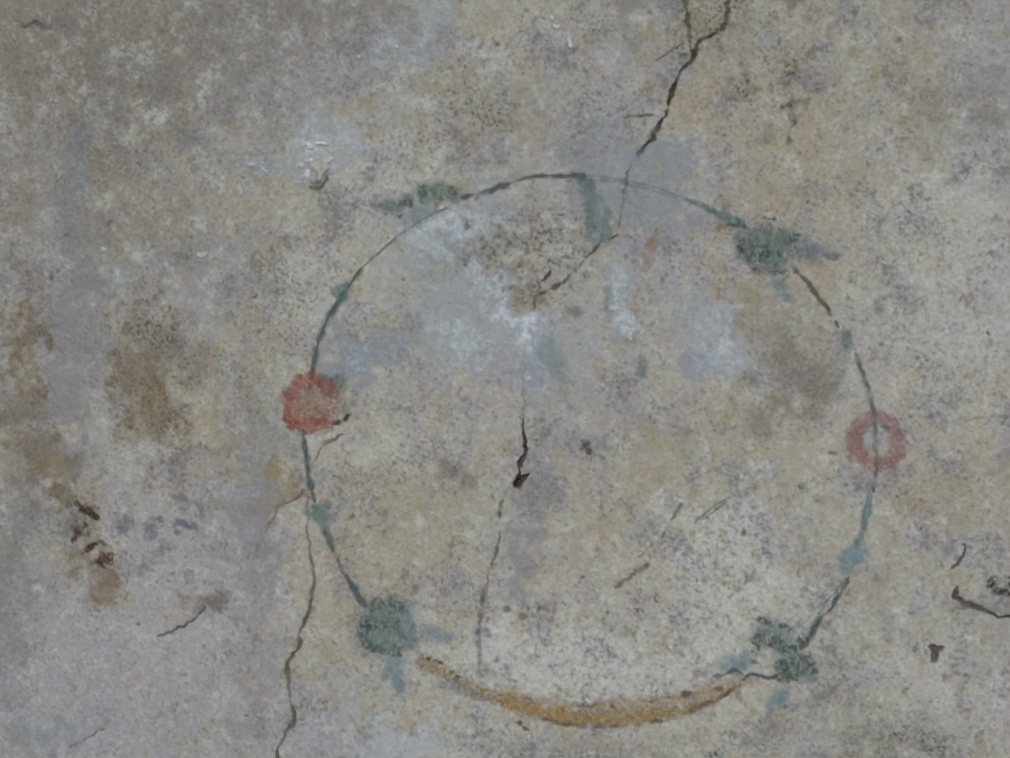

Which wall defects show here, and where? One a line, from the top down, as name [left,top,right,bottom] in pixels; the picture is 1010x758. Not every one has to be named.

crack [622,1,730,202]
peeling [298,141,333,190]
crack [532,271,569,312]
crack [513,425,529,487]
crack [952,546,966,600]
crack [285,556,315,676]
crack [276,706,296,758]